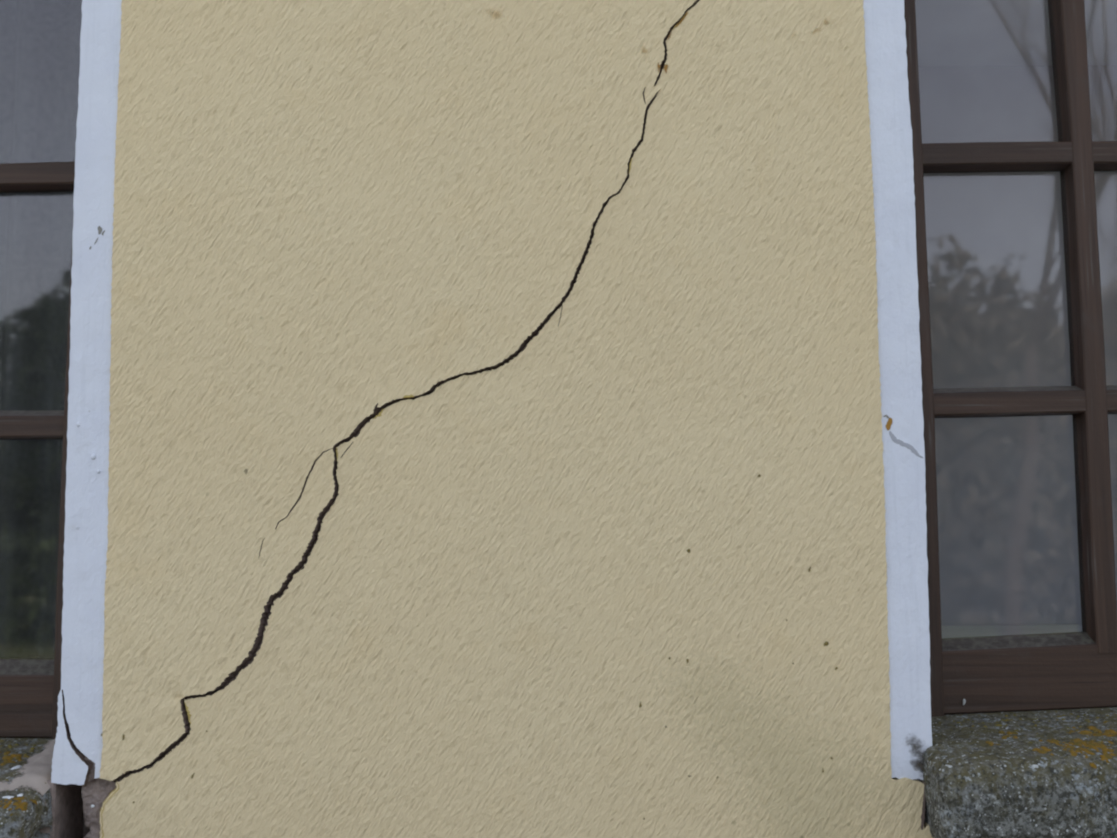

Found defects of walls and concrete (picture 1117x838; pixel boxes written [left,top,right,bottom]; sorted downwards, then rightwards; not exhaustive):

crack [62,0,700,787]
flaking render [38,755,124,838]